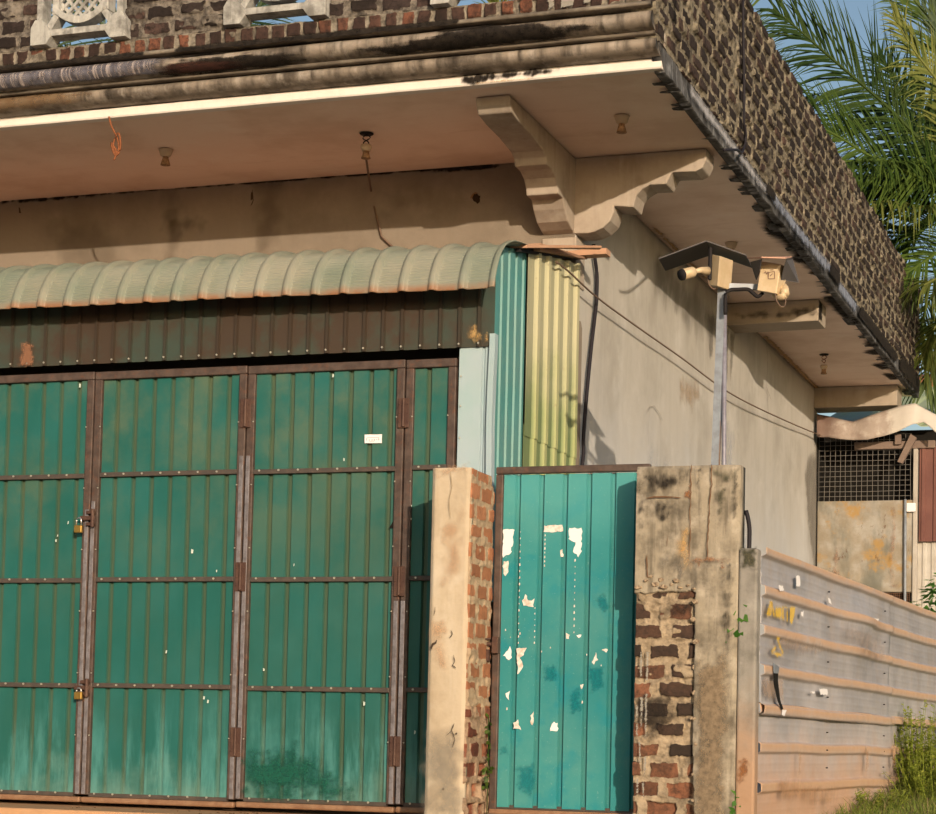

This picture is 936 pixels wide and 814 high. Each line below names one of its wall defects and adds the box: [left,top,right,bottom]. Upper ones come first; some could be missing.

water stain [0,15,591,110]
corrosion [20,344,33,365]
water stain [645,475,677,489]
spalling [632,575,700,814]
spalling [455,706,491,814]